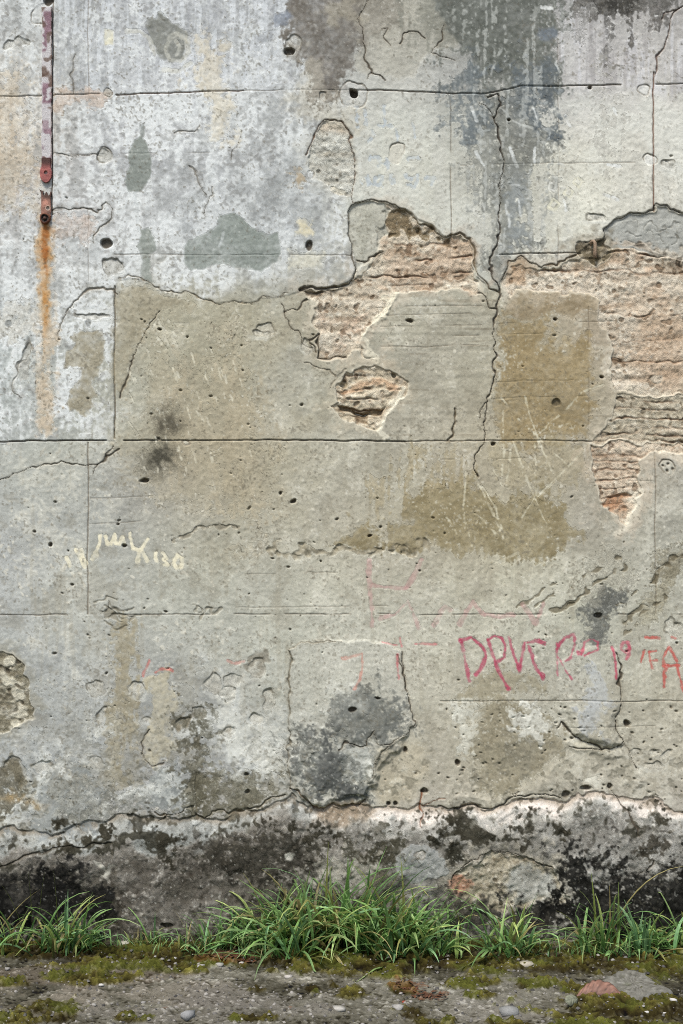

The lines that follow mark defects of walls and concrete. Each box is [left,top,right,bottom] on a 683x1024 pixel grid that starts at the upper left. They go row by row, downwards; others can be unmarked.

corrosion [0,63,99,439]
crack [31,447,121,469]
crack [52,93,683,479]
spalling [301,186,479,431]
water stain [328,0,683,650]
spalling [501,207,683,525]
spalling [0,652,35,734]
crack [0,842,113,868]
water stain [0,611,410,943]
crack [418,792,558,826]
crack [556,652,624,751]
crack [621,805,641,838]